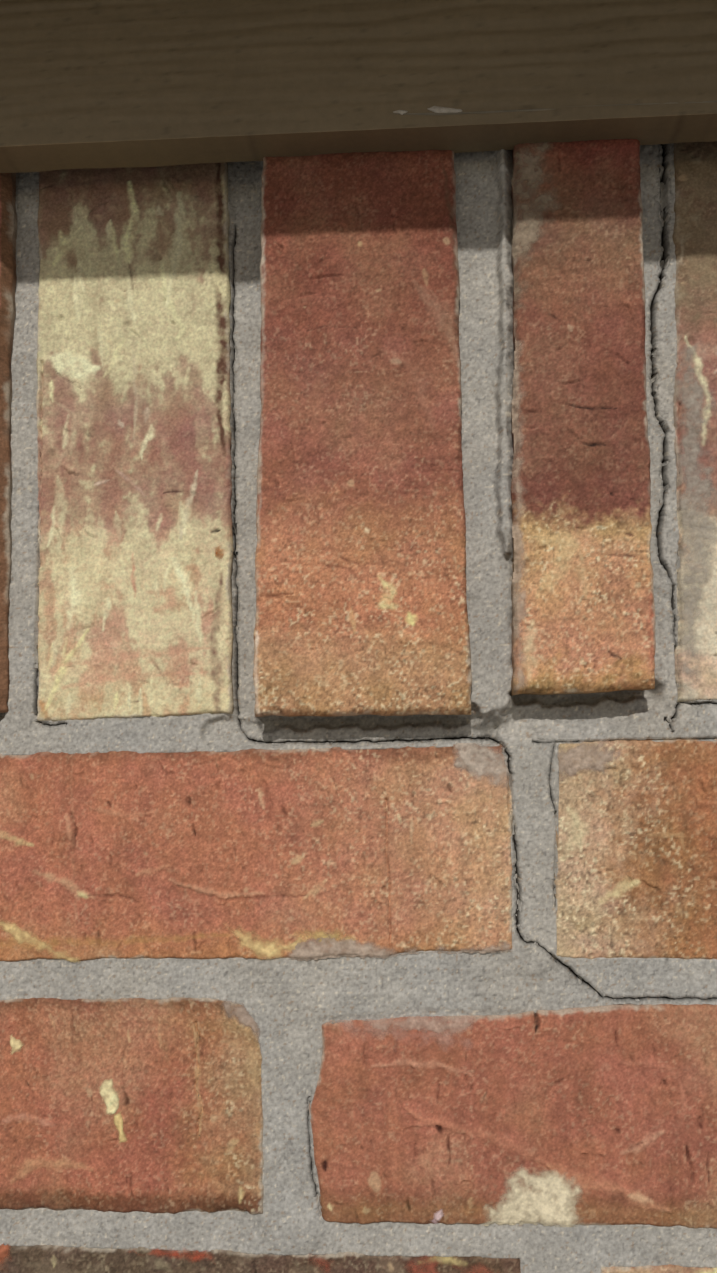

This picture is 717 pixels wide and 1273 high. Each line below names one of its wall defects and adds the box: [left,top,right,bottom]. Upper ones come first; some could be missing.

crack [229,225,592,813]
crack [647,144,717,740]
crack [510,811,717,1005]